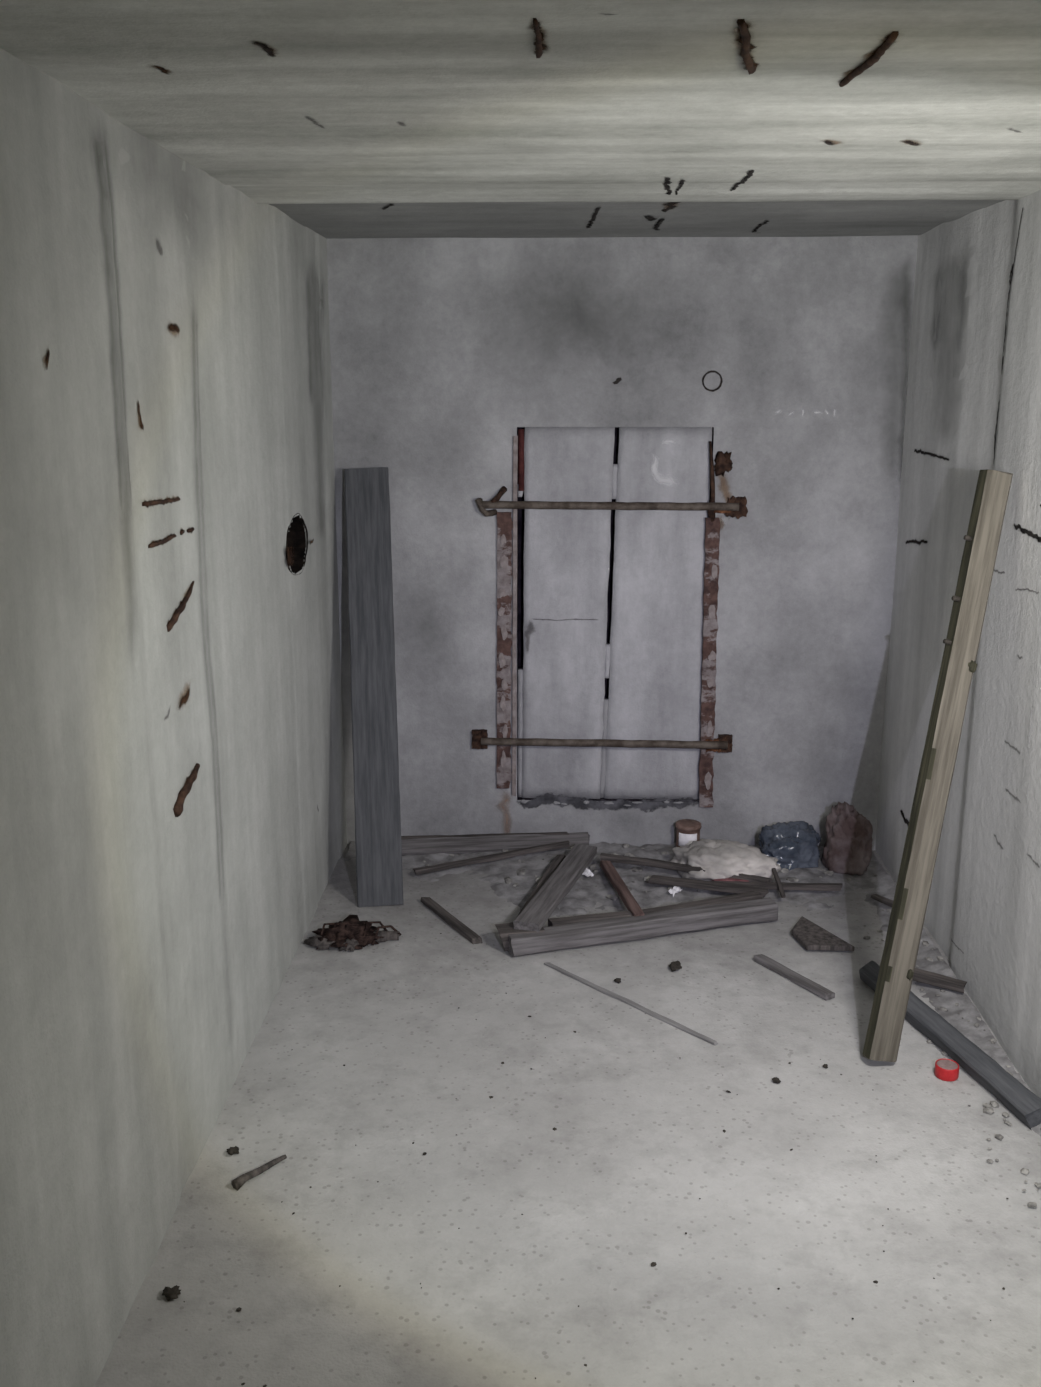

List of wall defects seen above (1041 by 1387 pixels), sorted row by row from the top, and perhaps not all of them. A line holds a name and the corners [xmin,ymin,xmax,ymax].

hole [286,513,314,575]
corrosion [165,686,190,719]